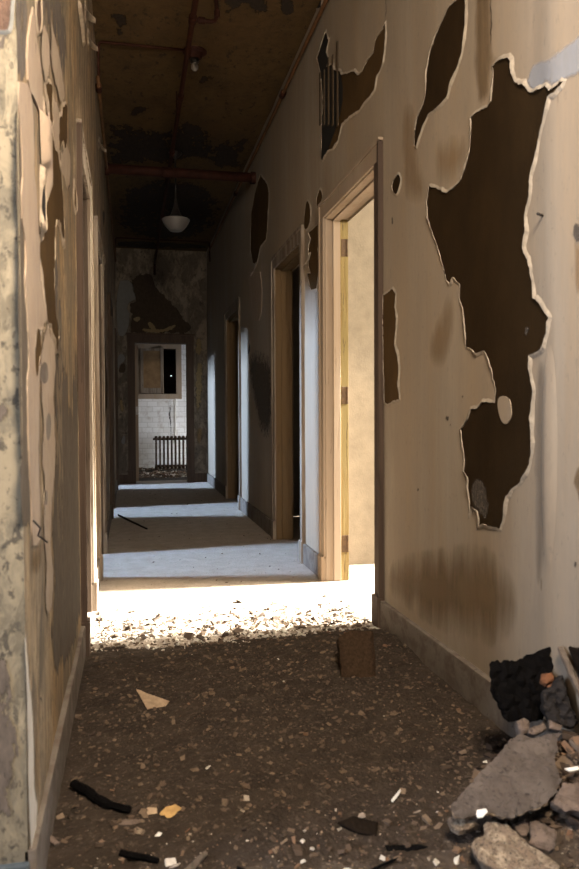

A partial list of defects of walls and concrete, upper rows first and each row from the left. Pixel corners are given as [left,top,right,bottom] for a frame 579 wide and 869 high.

peeling [316,21,387,162]
peeling [414,0,468,149]
peeling [0,0,81,675]
peeling [426,38,579,532]
peeling [25,638,37,847]